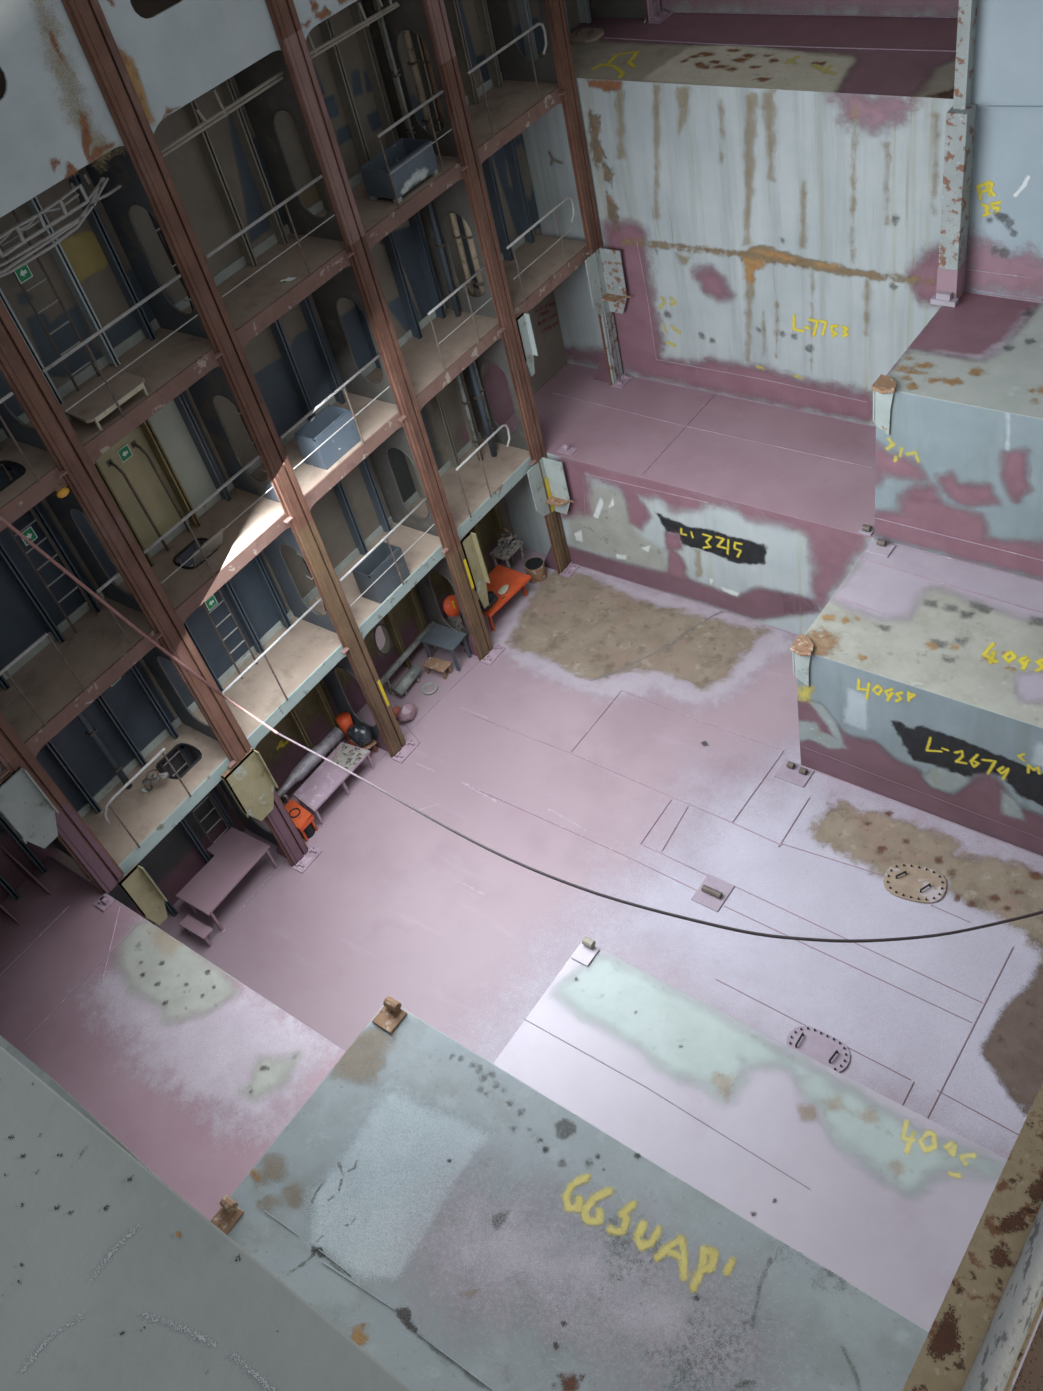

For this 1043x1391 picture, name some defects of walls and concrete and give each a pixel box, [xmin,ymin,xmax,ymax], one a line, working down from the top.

corrosion [27,0,125,179]
corrosion [586,79,627,159]
corrosion [923,84,954,218]
corrosion [622,48,936,363]
corrosion [894,356,991,390]
peeling [567,482,670,573]
peeling [799,687,871,751]
peeling [922,767,972,793]
peeling [999,790,1027,822]
corrosion [933,855,1043,910]
corrosion [989,1173,1043,1269]
corrosion [927,1304,965,1362]